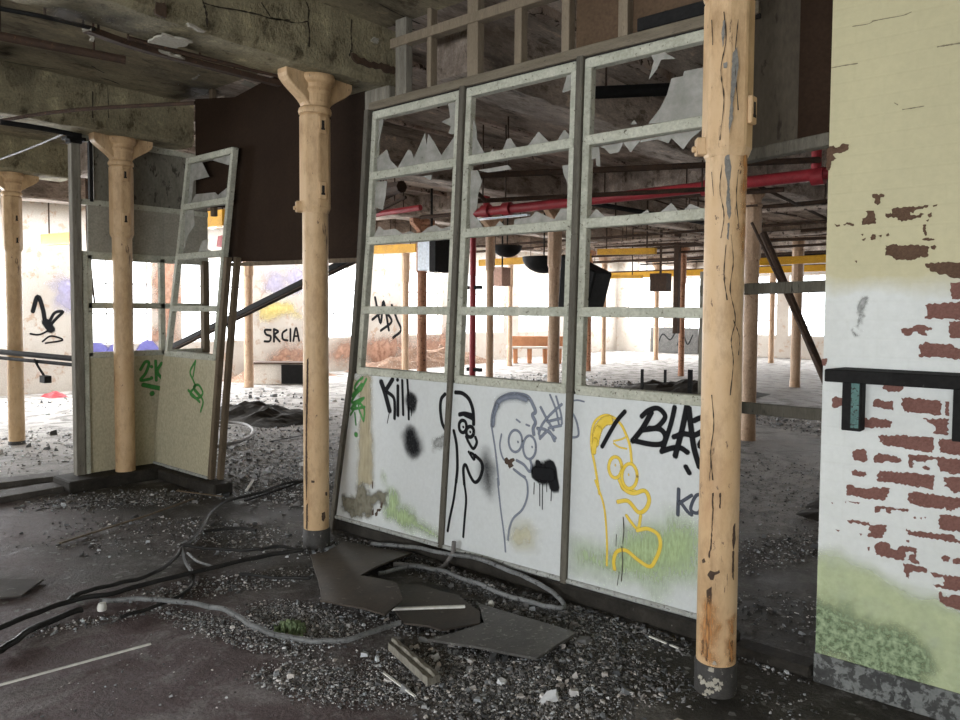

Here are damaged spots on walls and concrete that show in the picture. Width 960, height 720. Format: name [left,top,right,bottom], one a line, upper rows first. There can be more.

peeling [148,23,206,59]
crack [202,0,311,47]
peeling [723,48,739,132]
spalling [826,143,849,170]
peeling [835,194,960,360]
peeling [845,385,960,610]
peeling [698,559,723,696]